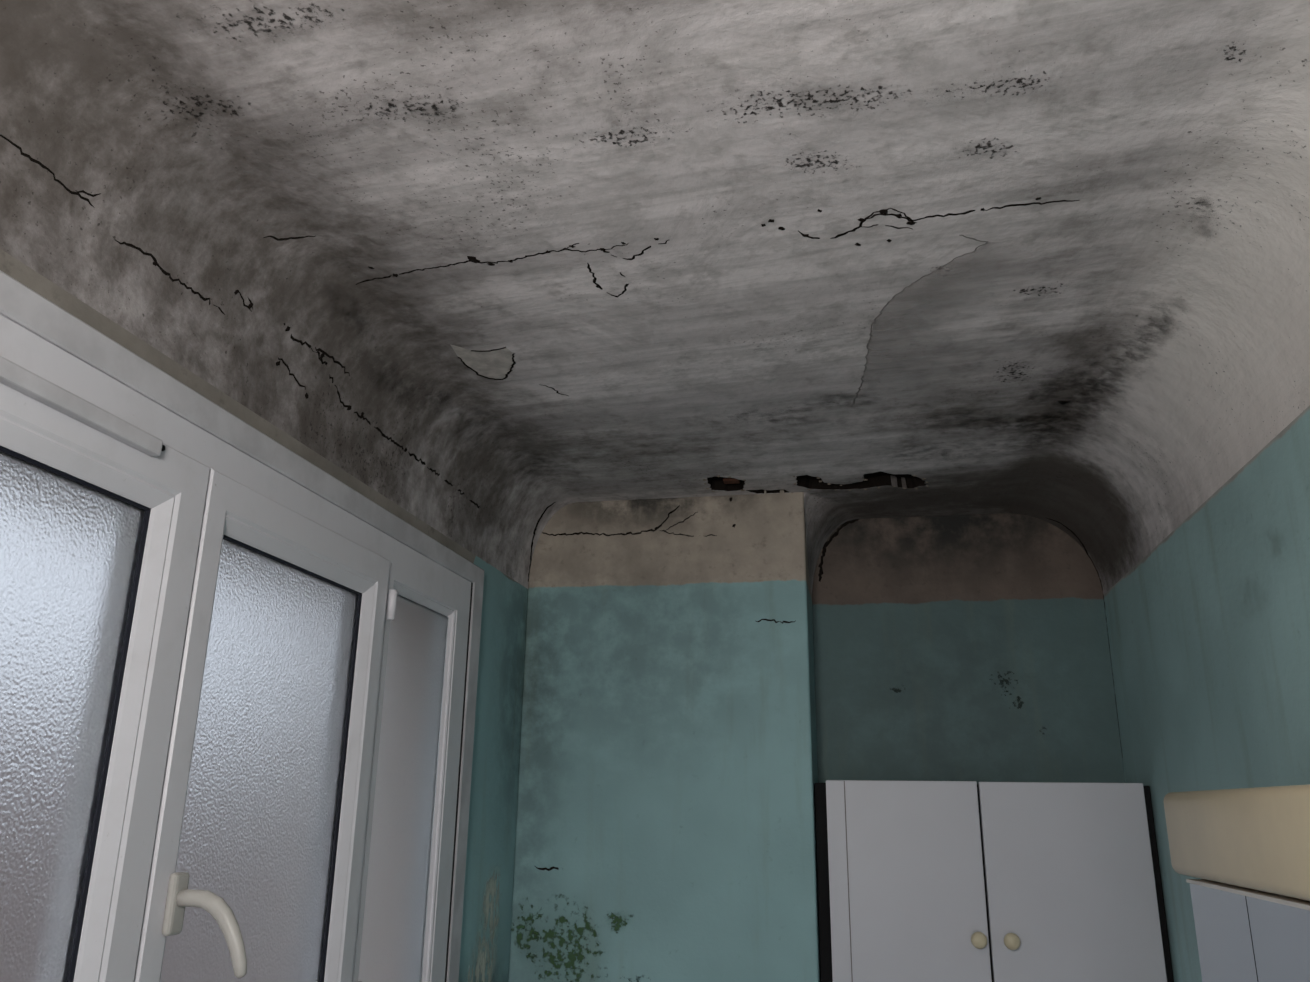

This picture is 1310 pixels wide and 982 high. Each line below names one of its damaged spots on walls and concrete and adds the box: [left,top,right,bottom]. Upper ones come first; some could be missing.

water stain [205,4,344,42]
water stain [365,96,458,122]
water stain [707,85,911,123]
water stain [970,72,1049,95]
water stain [577,127,670,146]
crack [0,134,101,208]
crack [761,197,1079,246]
crack [115,240,253,315]
crack [356,238,669,298]
crack [276,323,480,509]
spalling [703,471,929,494]
water stain [468,876,633,982]